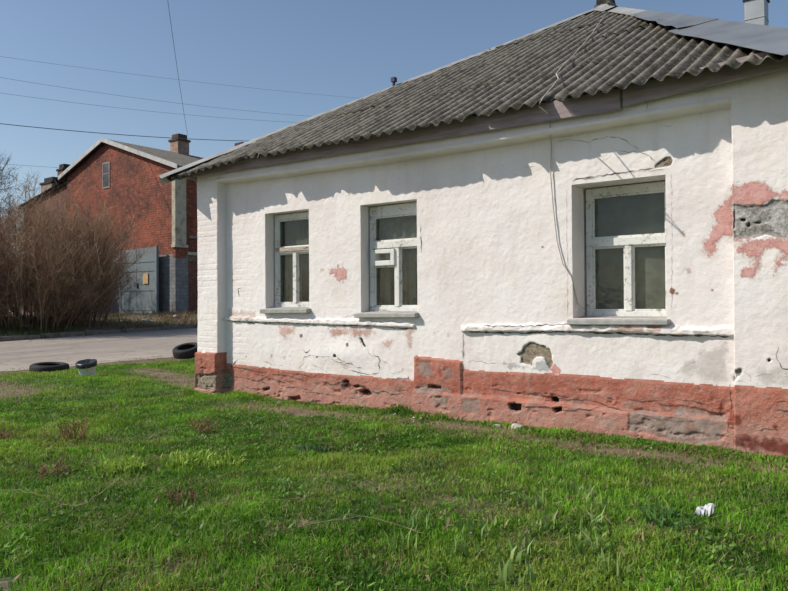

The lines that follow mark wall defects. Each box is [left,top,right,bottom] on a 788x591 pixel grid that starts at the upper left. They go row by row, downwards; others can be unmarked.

spalling [655,157,672,168]
crack [462,136,729,364]
peeling [704,181,788,278]
peeling [321,264,348,283]
crack [196,351,403,396]
spalling [517,342,553,369]
crack [489,370,763,440]
spalling [628,405,741,444]